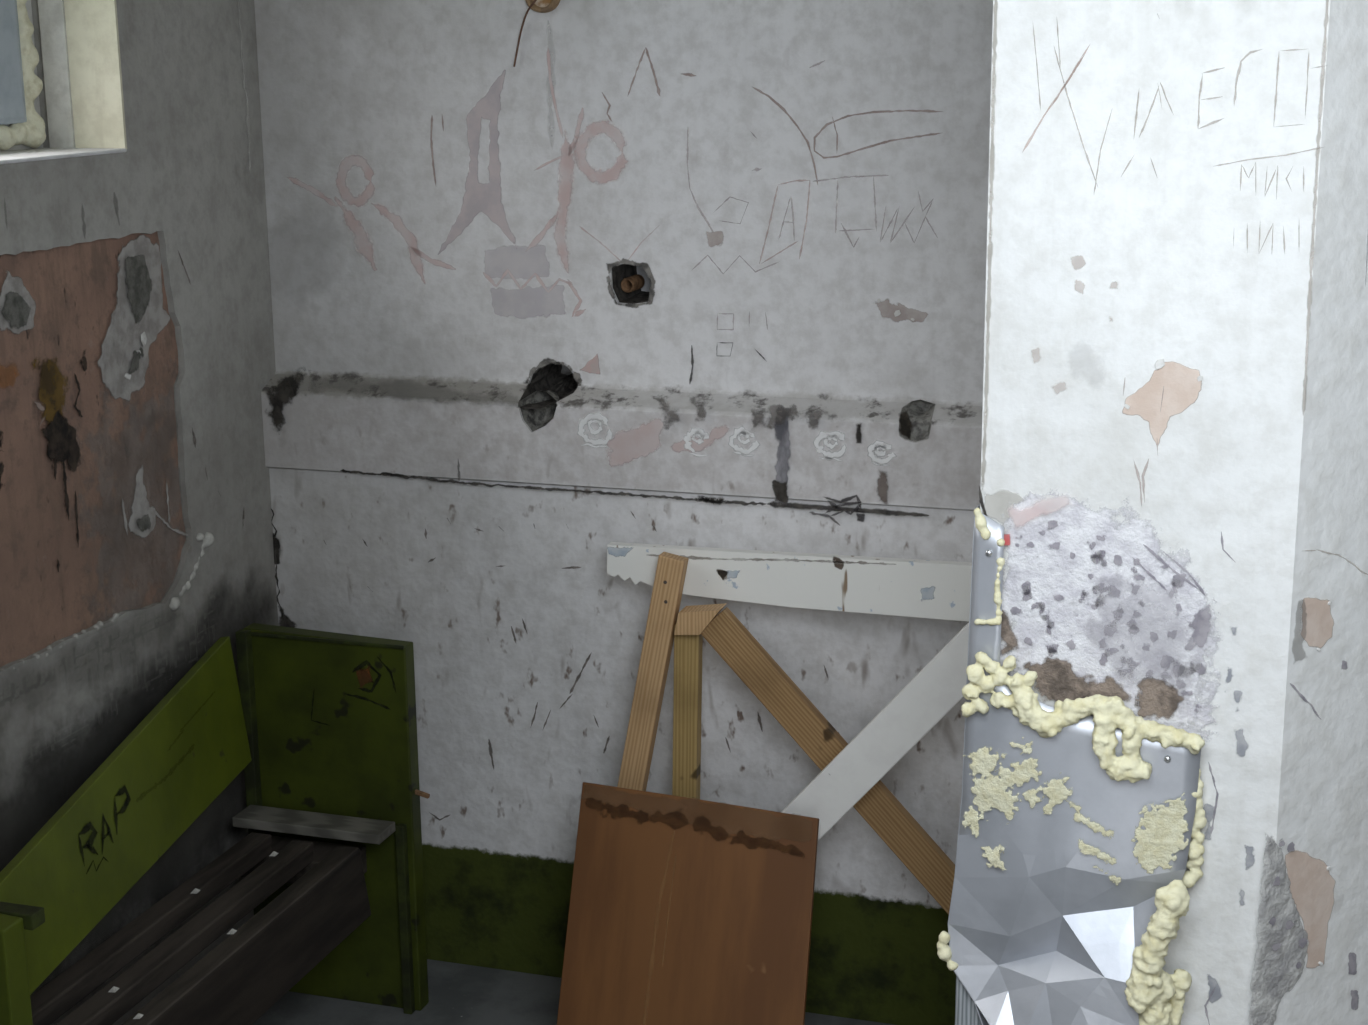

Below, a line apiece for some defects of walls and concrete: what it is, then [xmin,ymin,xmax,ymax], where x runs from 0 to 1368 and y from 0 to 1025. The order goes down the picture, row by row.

spalling [607,258,655,308]
spalling [518,355,600,432]
flaking render [0,231,214,671]
crack [341,461,929,517]
spalling [979,359,1242,737]
spalling [1301,598,1334,651]
peeling [1235,730,1248,756]
peeling [1204,764,1219,840]
spalling [1240,836,1335,1025]
peeling [1204,976,1221,1025]